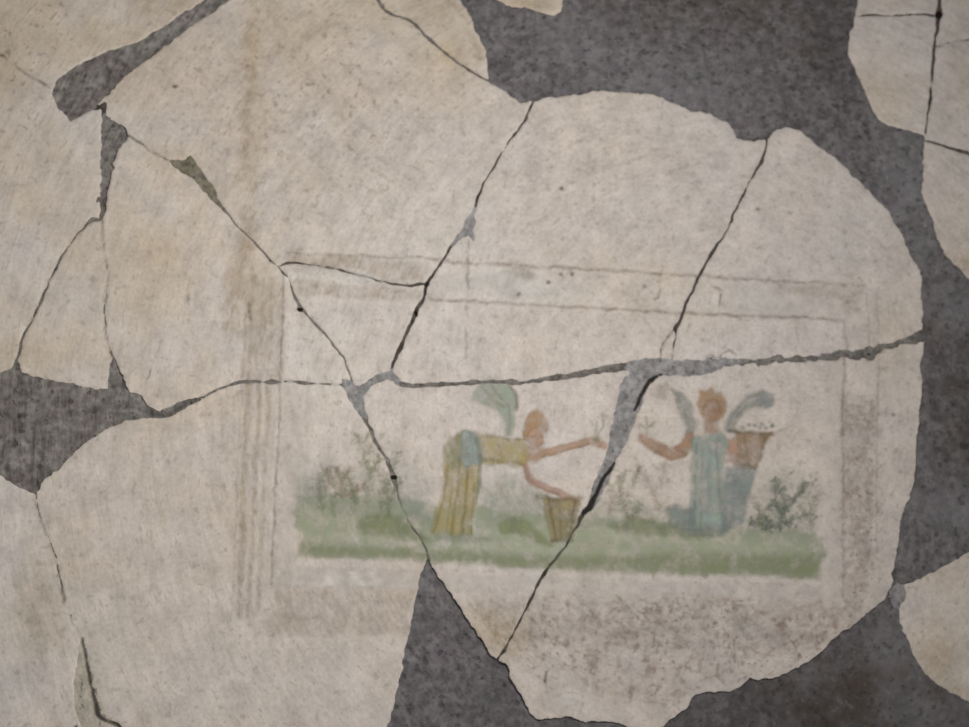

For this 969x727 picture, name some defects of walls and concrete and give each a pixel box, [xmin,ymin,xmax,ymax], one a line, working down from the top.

crack [95,103,107,114]
crack [376,0,485,80]
crack [474,104,533,209]
crack [862,0,969,155]
crack [18,217,103,358]
crack [200,141,767,411]
crack [739,330,923,366]
crack [362,417,430,562]
crack [496,462,615,660]
crack [75,646,121,727]